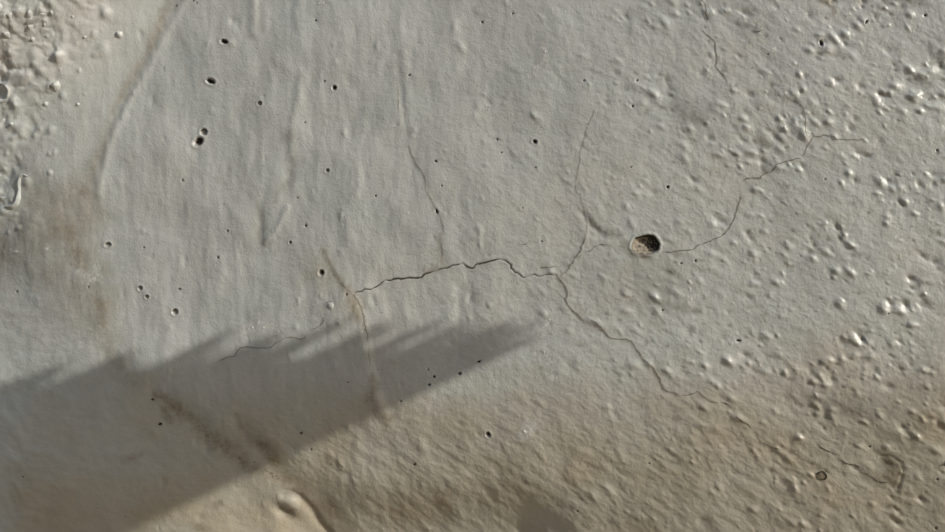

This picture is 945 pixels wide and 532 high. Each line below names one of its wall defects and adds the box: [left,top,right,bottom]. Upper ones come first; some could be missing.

crack [702,0,733,96]
crack [663,99,865,253]
crack [220,110,780,450]